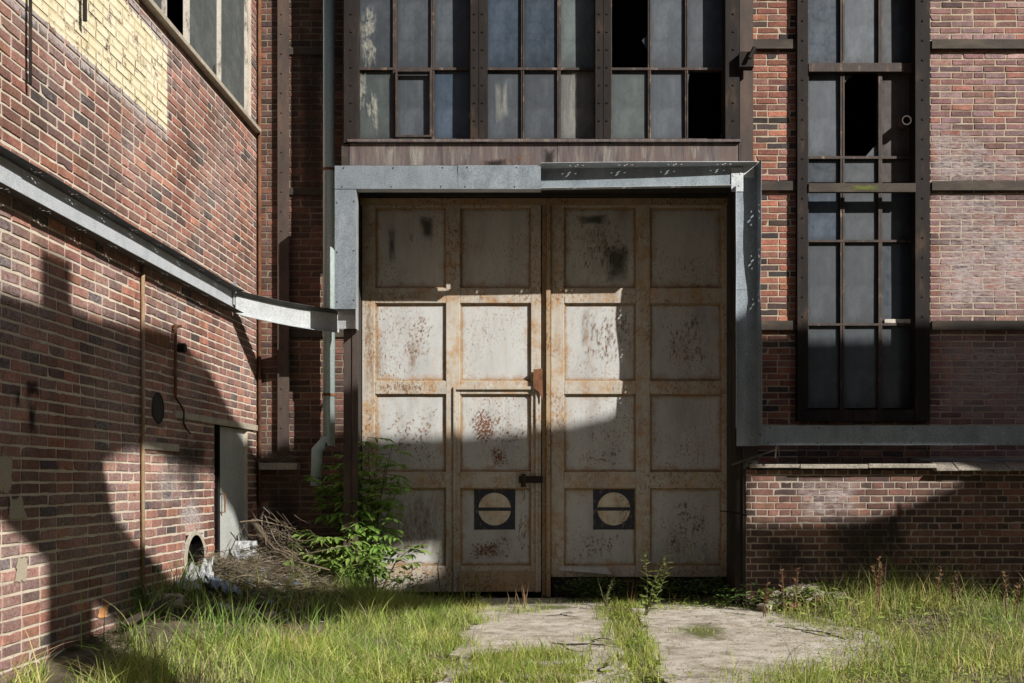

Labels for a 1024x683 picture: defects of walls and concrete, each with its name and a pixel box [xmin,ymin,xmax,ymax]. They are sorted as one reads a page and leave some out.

corrosion [380,311,434,391]
corrosion [581,310,630,371]
corrosion [470,406,524,467]